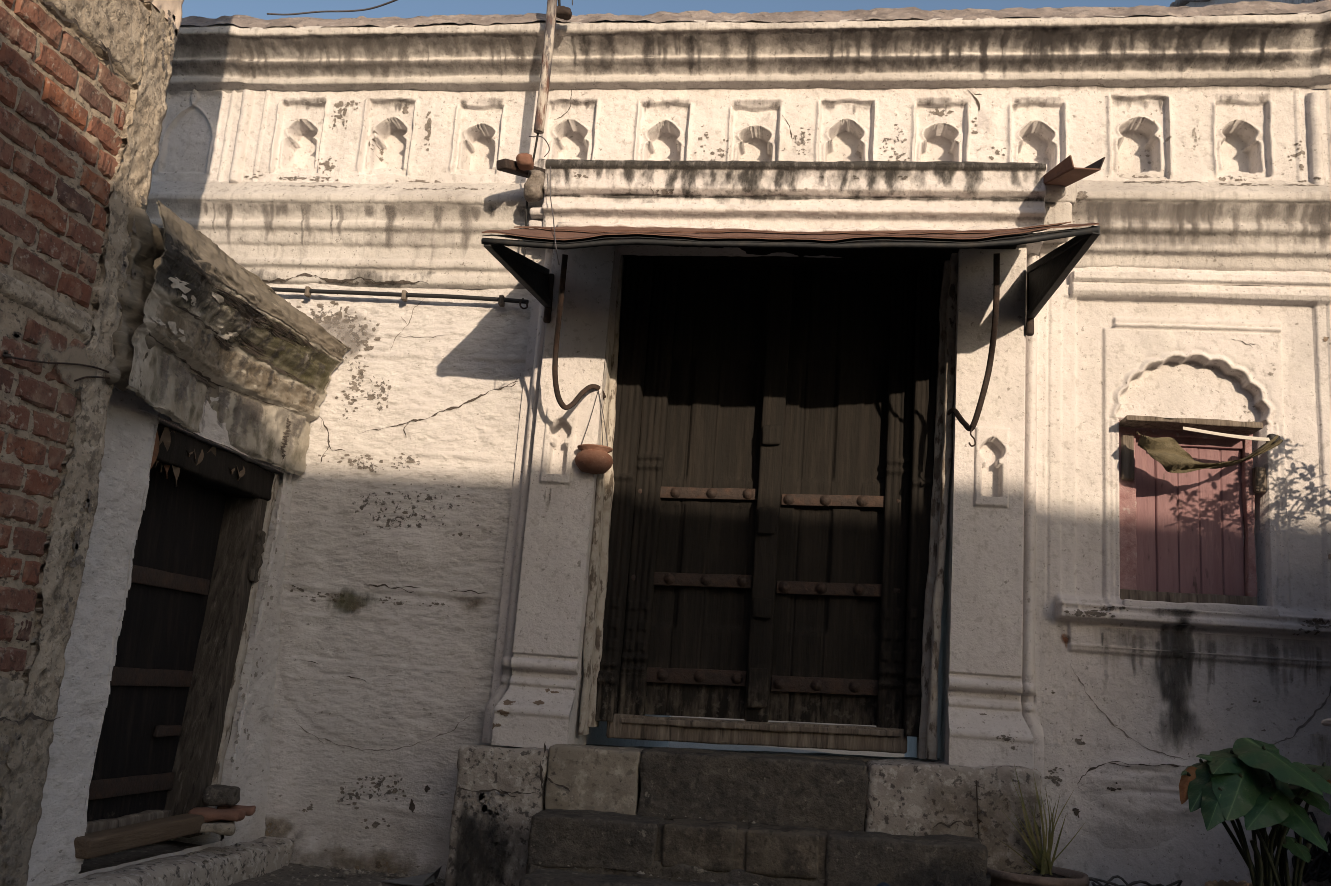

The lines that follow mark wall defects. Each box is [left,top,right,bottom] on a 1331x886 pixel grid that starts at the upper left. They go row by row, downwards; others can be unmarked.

damp [572,23,1293,89]
damp [366,205,395,244]
damp [539,159,1046,217]
crack [149,256,521,462]
peeling [289,301,391,419]
peeling [318,453,491,537]
crack [1070,664,1187,784]
damp [1156,608,1195,743]
crack [1274,686,1331,745]